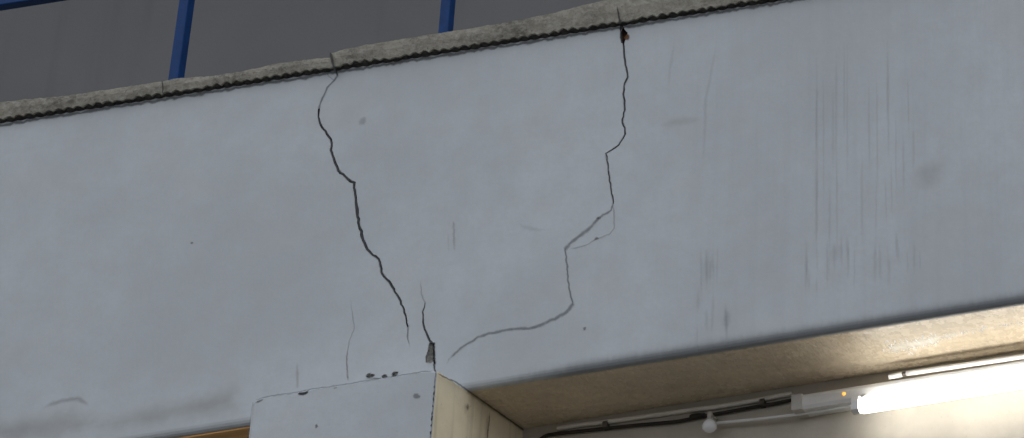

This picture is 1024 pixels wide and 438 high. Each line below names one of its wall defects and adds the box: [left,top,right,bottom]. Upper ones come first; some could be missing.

crack [605,8,628,203]
crack [318,108,524,438]